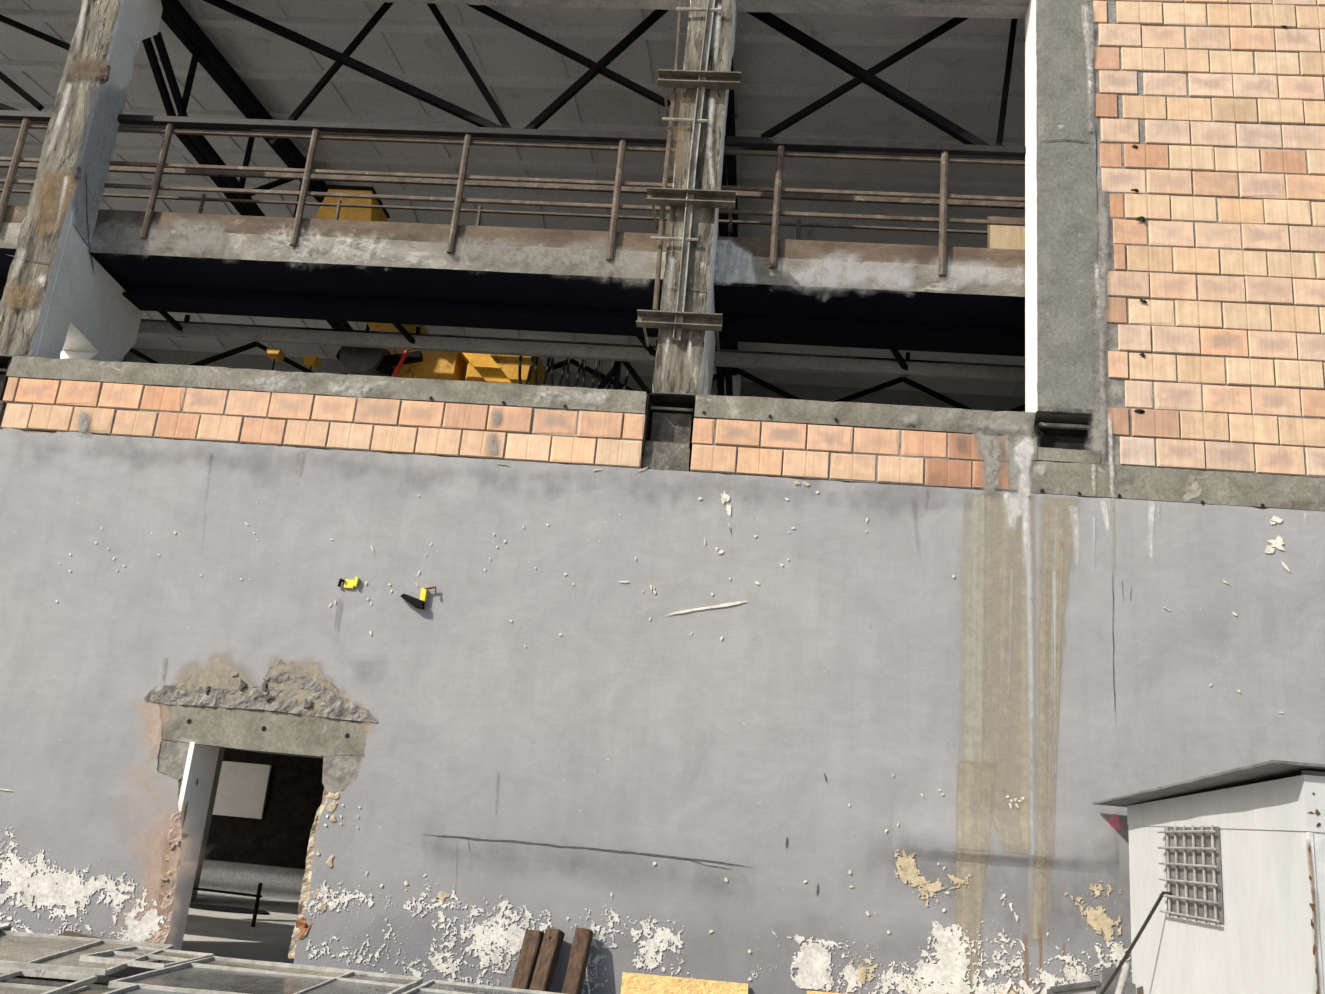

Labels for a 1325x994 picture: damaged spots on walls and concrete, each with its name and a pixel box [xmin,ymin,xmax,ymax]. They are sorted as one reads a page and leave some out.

damp [1083,1,1095,131]
rust [36,170,76,234]
damp [900,413,918,424]
damp [952,190,1131,994]
spalling [144,659,378,723]
peeling [288,791,692,994]
crack [422,834,749,894]
peeling [745,849,1132,994]
rust [1307,844,1320,994]